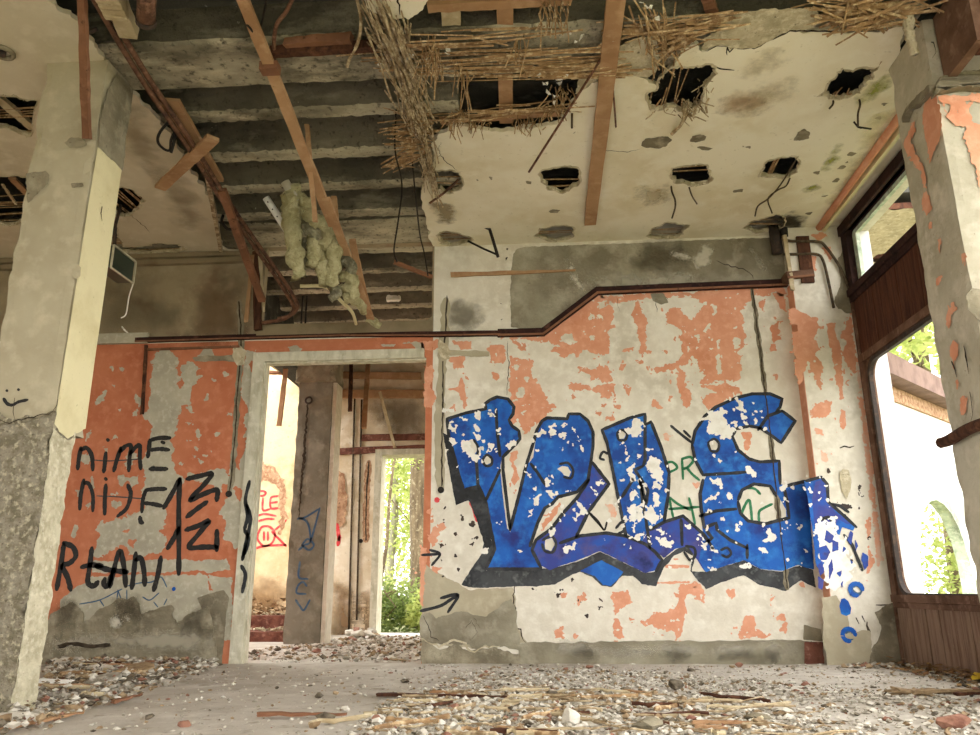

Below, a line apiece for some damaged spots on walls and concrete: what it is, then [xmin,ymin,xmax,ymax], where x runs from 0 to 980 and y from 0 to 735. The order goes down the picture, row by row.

peeling [902,69,980,229]
spalling [0,346,256,710]
spalling [381,232,901,665]
water stain [597,244,713,286]
peeling [950,340,968,415]
spalling [946,288,980,328]